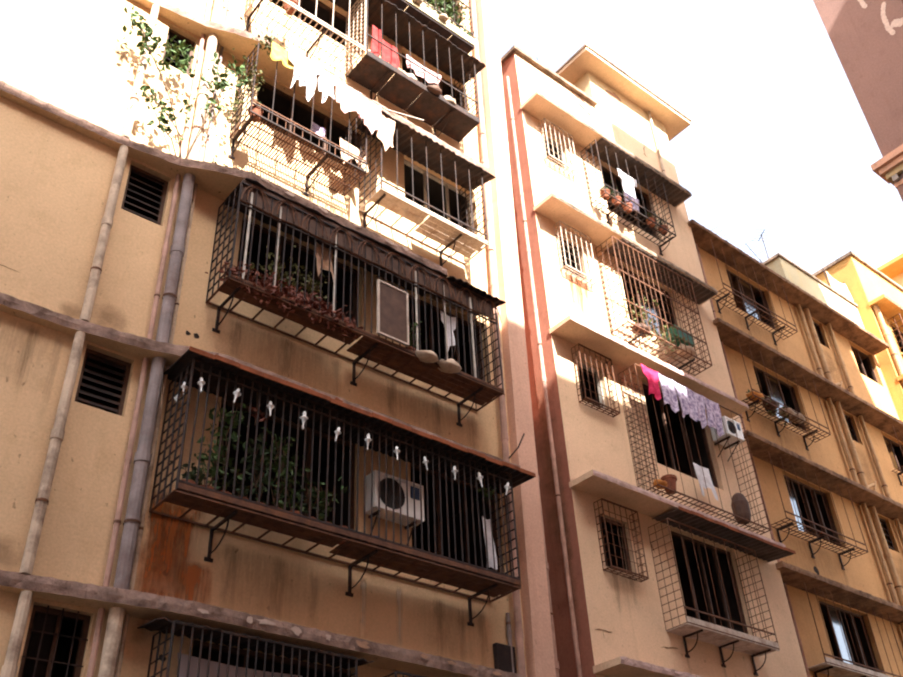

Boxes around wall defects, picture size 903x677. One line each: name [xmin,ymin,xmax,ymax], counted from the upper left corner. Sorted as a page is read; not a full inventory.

corrosion [143,495,209,601]